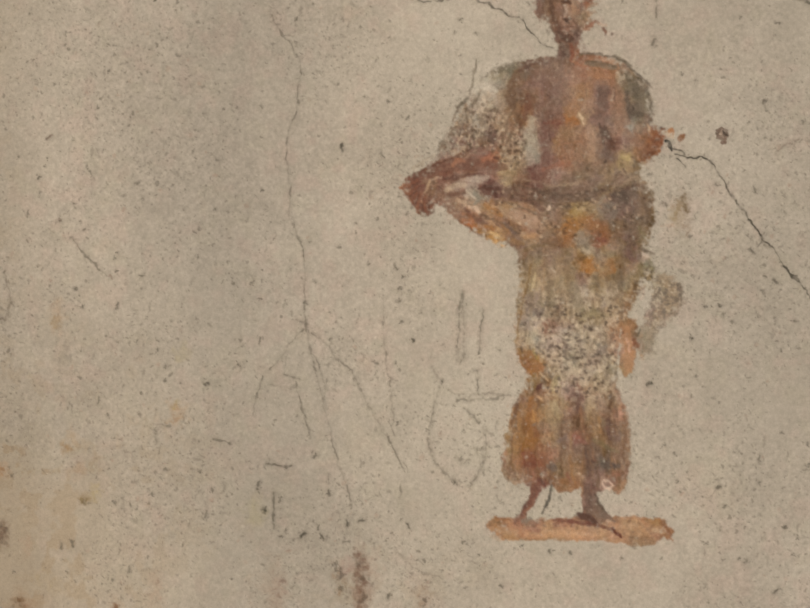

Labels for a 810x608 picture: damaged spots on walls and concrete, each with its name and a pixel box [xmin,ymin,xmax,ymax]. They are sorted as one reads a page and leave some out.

crack [406,0,555,51]
crack [662,136,810,302]